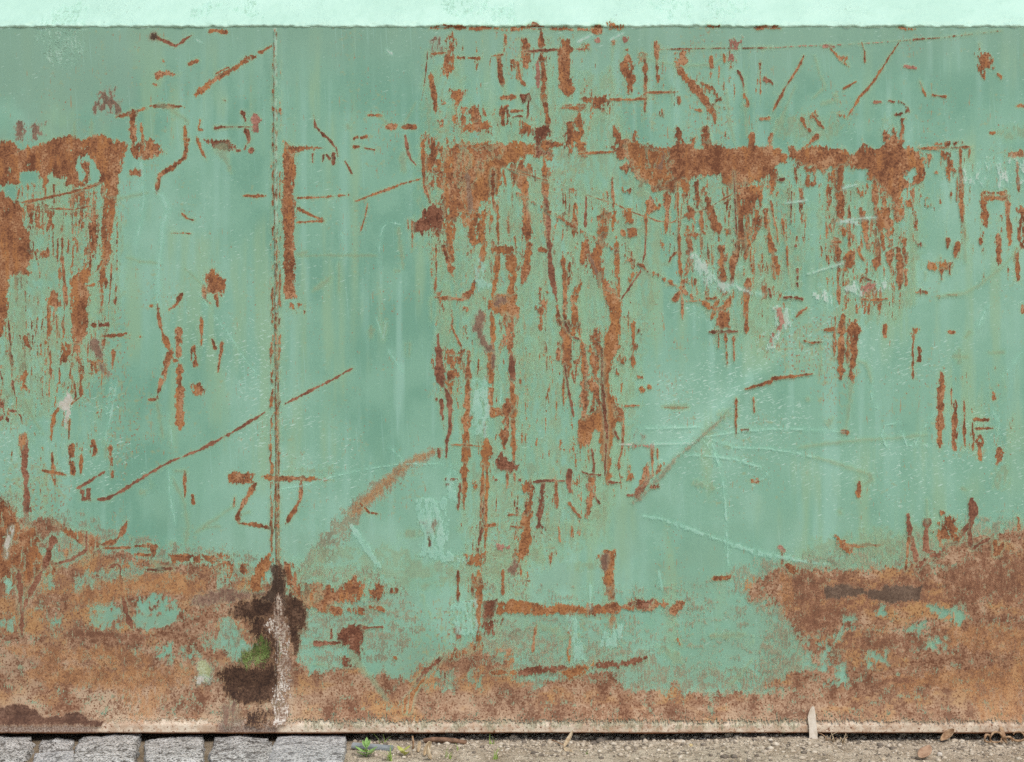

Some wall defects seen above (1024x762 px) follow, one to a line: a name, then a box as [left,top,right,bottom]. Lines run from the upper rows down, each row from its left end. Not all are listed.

corrosion [800,110,825,132]
corrosion [39,424,98,485]
corrosion [0,103,185,429]
corrosion [173,317,224,431]
corrosion [534,287,550,331]
corrosion [911,328,922,379]
corrosion [935,365,1008,466]
damp [215,563,308,729]